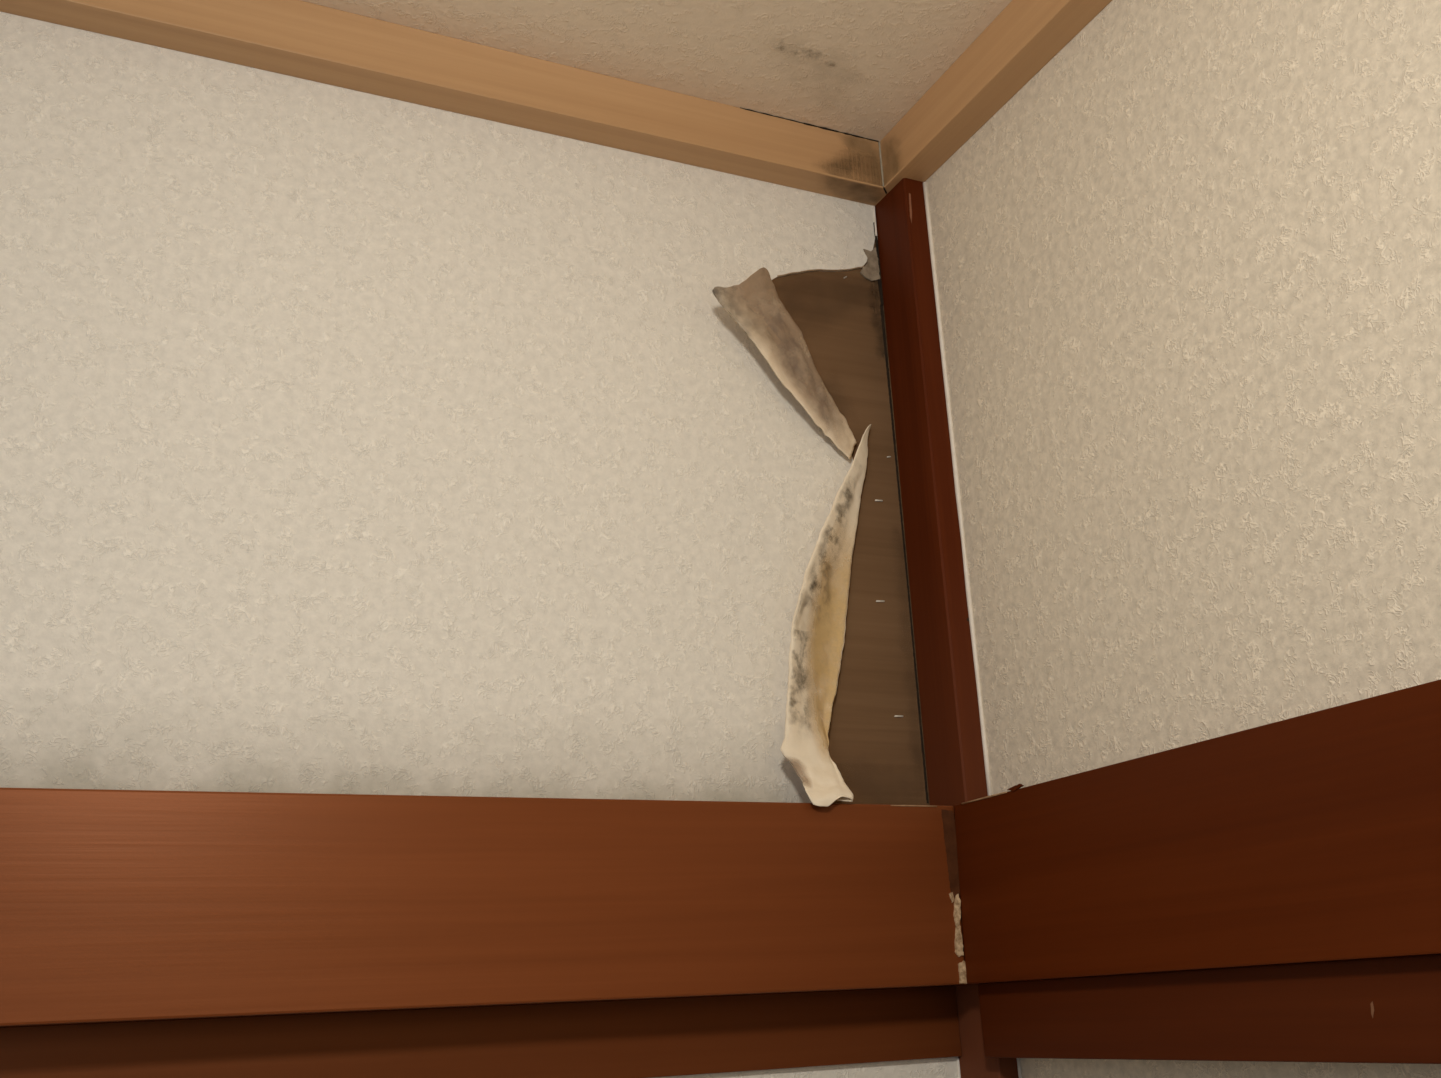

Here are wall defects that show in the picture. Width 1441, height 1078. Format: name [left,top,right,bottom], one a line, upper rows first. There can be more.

leakage [791,564,850,746]